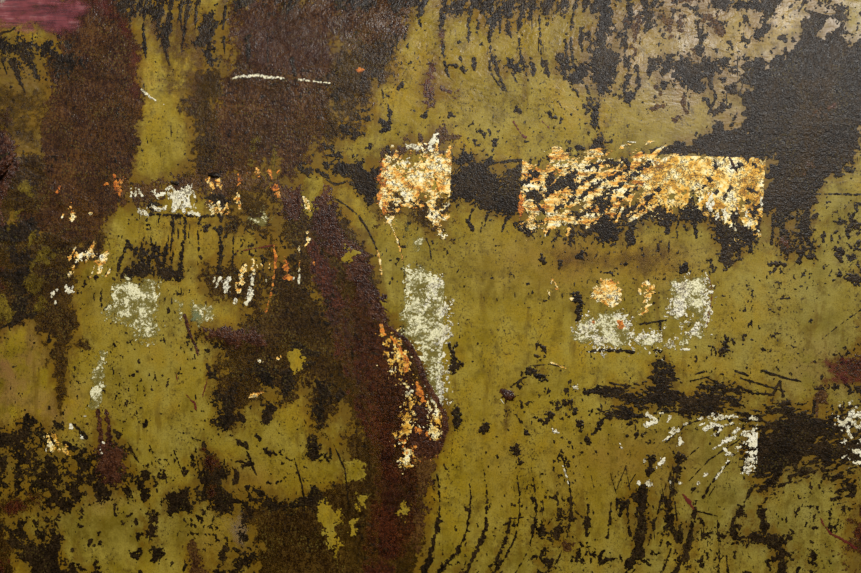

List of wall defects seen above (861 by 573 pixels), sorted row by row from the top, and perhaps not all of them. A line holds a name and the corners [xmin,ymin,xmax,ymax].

rust [277,184,450,564]
peeling [361,308,480,503]
peeling [828,343,860,368]